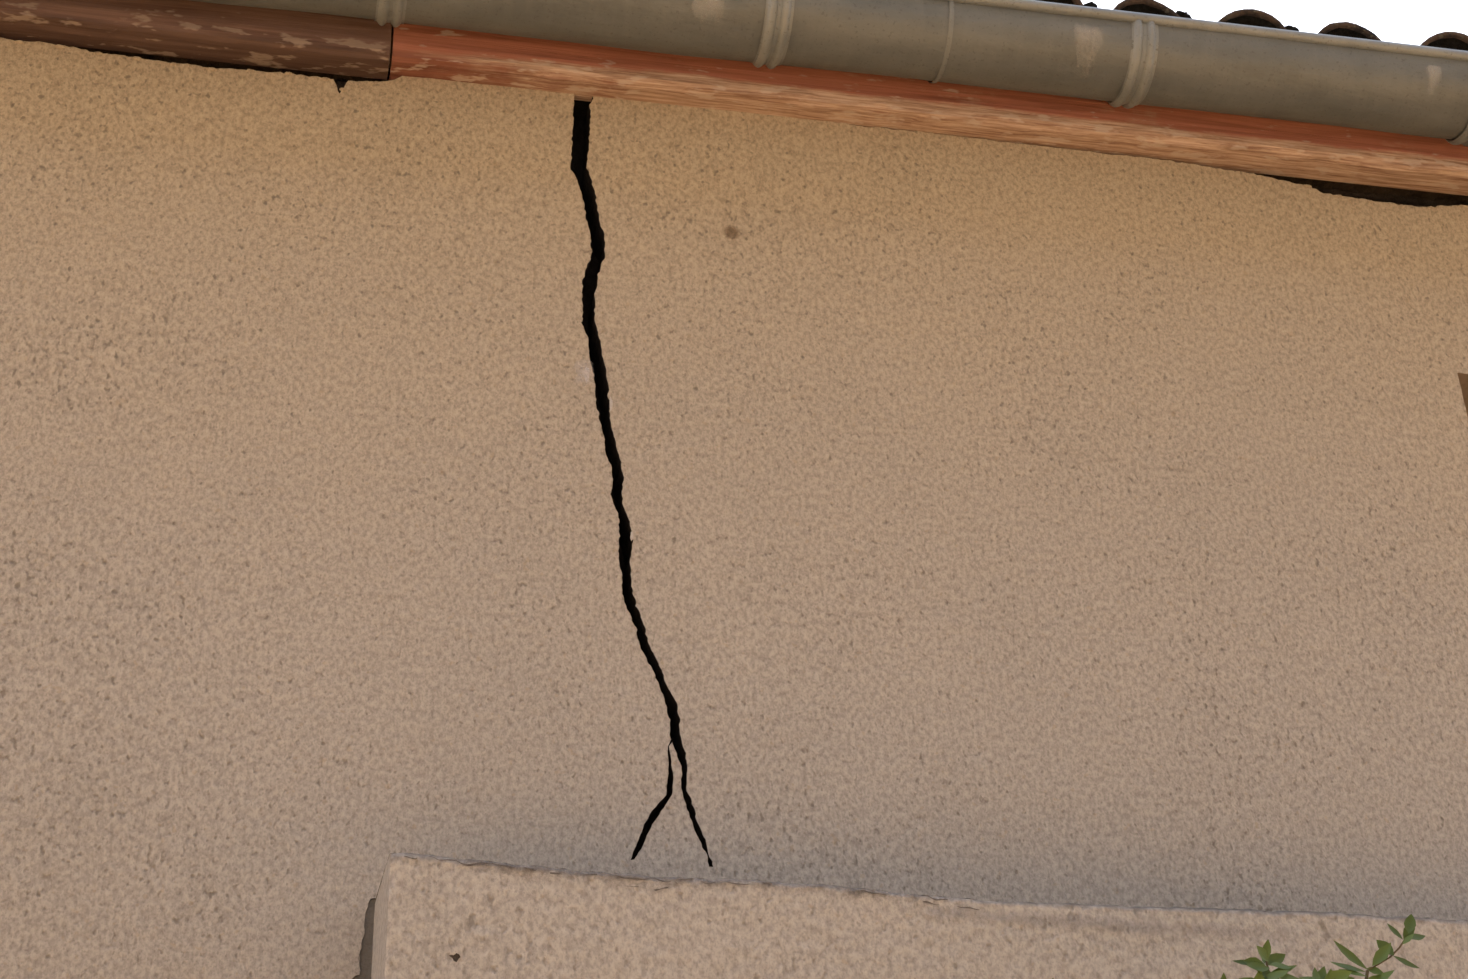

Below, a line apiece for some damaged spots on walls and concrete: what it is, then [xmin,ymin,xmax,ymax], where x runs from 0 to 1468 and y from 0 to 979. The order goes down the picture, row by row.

crack [405,97,772,891]
crack [921,895,979,910]